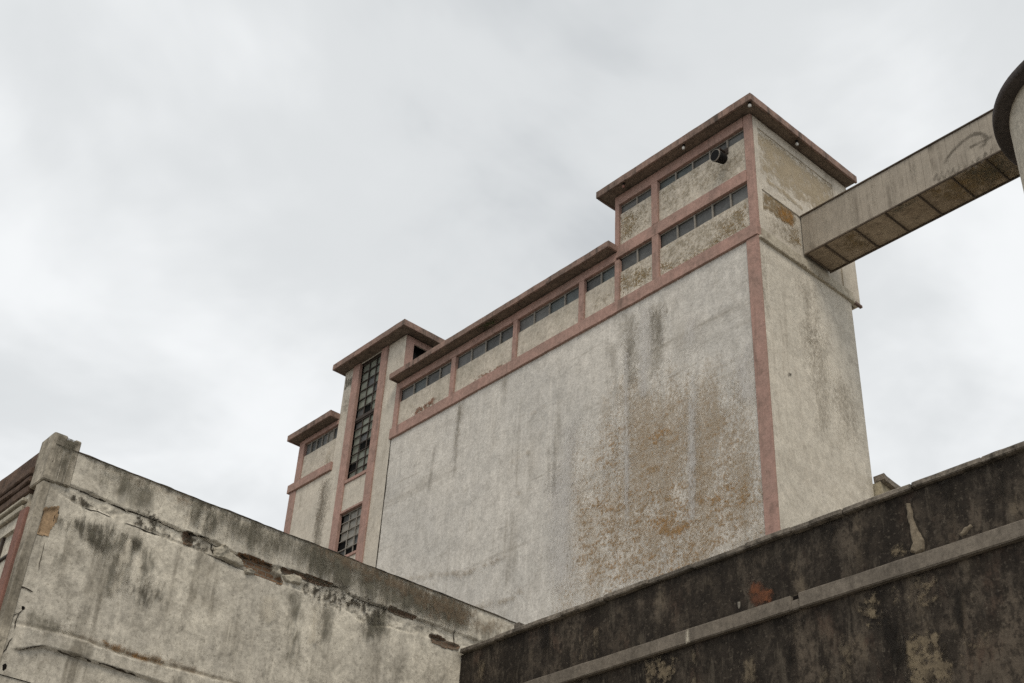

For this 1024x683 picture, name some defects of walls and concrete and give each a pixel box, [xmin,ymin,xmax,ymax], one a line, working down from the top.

rust [763,194,795,226]
spalling [37,506,60,537]
crack [48,458,273,570]
damp [57,459,509,649]
rust [578,382,754,599]
peeling [906,503,926,554]